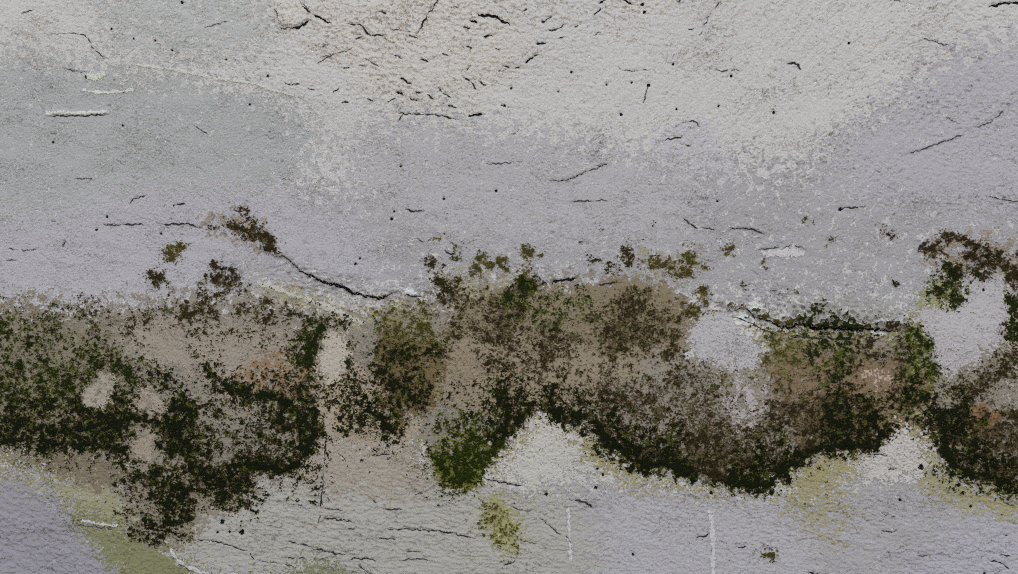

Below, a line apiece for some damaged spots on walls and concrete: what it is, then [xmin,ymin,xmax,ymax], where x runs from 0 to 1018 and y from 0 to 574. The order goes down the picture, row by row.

crack [272,254,452,321]
crack [726,308,903,340]
water stain [0,438,1018,574]